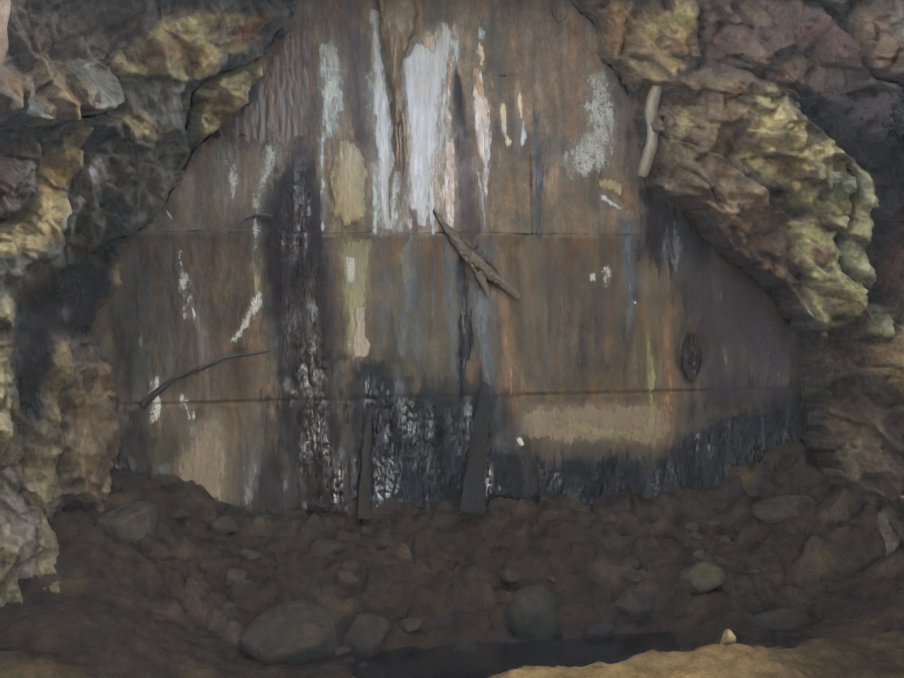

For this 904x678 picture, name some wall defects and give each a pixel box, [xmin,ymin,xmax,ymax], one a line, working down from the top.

leakage [224,155,242,200]
leakage [230,8,808,516]
leakage [111,372,166,482]